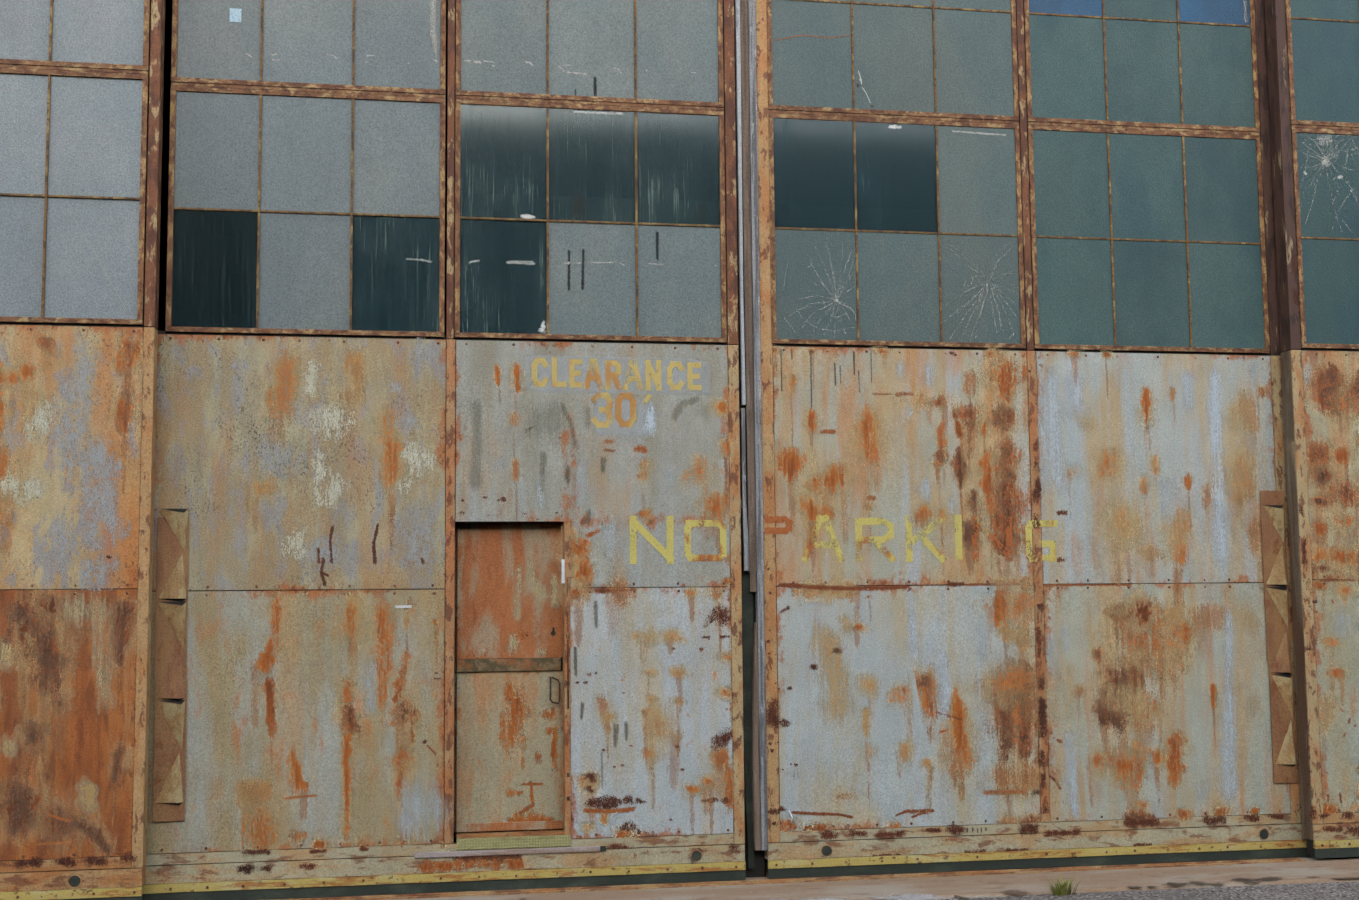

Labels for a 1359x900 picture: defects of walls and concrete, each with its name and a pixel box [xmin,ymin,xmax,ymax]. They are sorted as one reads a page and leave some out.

peeling [0,331,133,592]
rust [768,348,1042,557]
rust [1293,362,1359,607]
rust [251,595,287,739]
rust [237,674,374,874]
rust [332,593,436,801]
rust [416,843,541,874]
rust [497,682,559,831]
rust [574,771,646,858]
rust [709,727,734,812]
rust [769,578,911,613]
rust [857,575,1284,847]